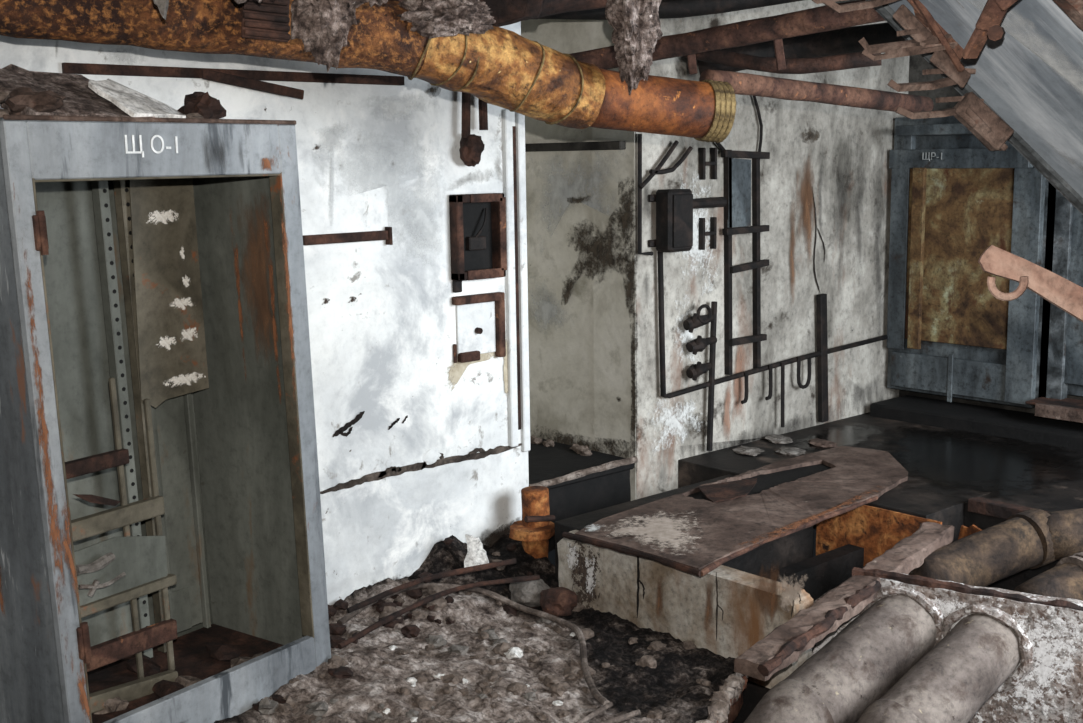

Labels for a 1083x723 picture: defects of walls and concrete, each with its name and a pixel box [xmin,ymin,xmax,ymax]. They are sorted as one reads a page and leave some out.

corrosion [790,163,813,294]
damp [530,180,638,458]
crack [320,443,522,494]
corrosion [756,572,778,619]
damp [813,614,859,654]
damp [935,599,971,631]
damp [997,613,1083,710]